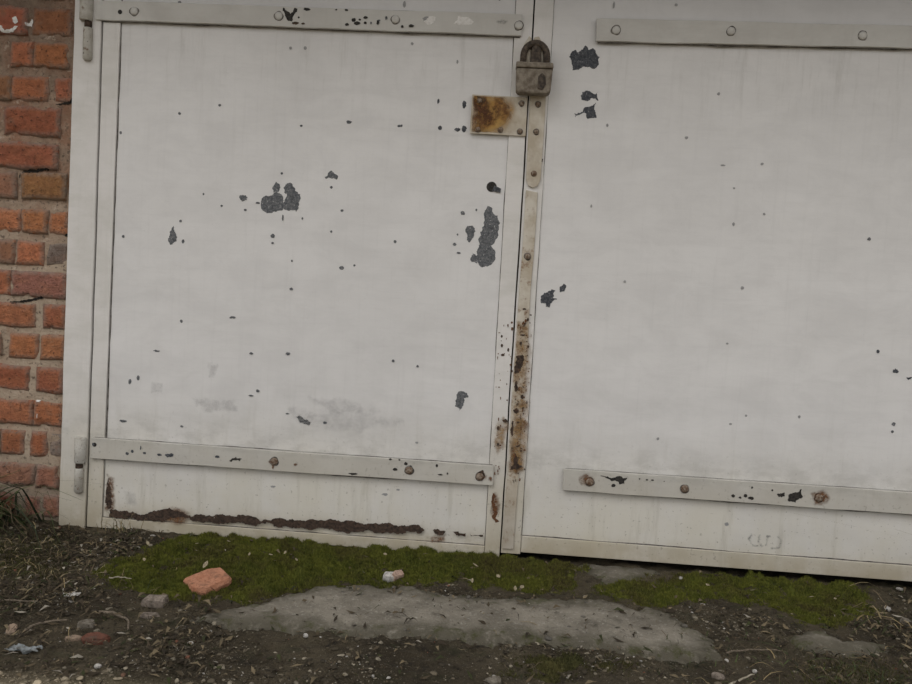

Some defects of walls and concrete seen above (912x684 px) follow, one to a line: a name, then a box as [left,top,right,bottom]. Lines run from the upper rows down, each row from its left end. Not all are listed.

peeling [283,8,311,25]
peeling [569,45,599,70]
rust [472,96,513,132]
peeling [575,91,598,119]
peeling [239,172,303,221]
peeling [453,206,500,267]
peeling [541,284,566,307]
rust [477,308,532,482]
rust [105,478,483,542]
rust [491,493,500,523]
peeling [771,489,803,502]